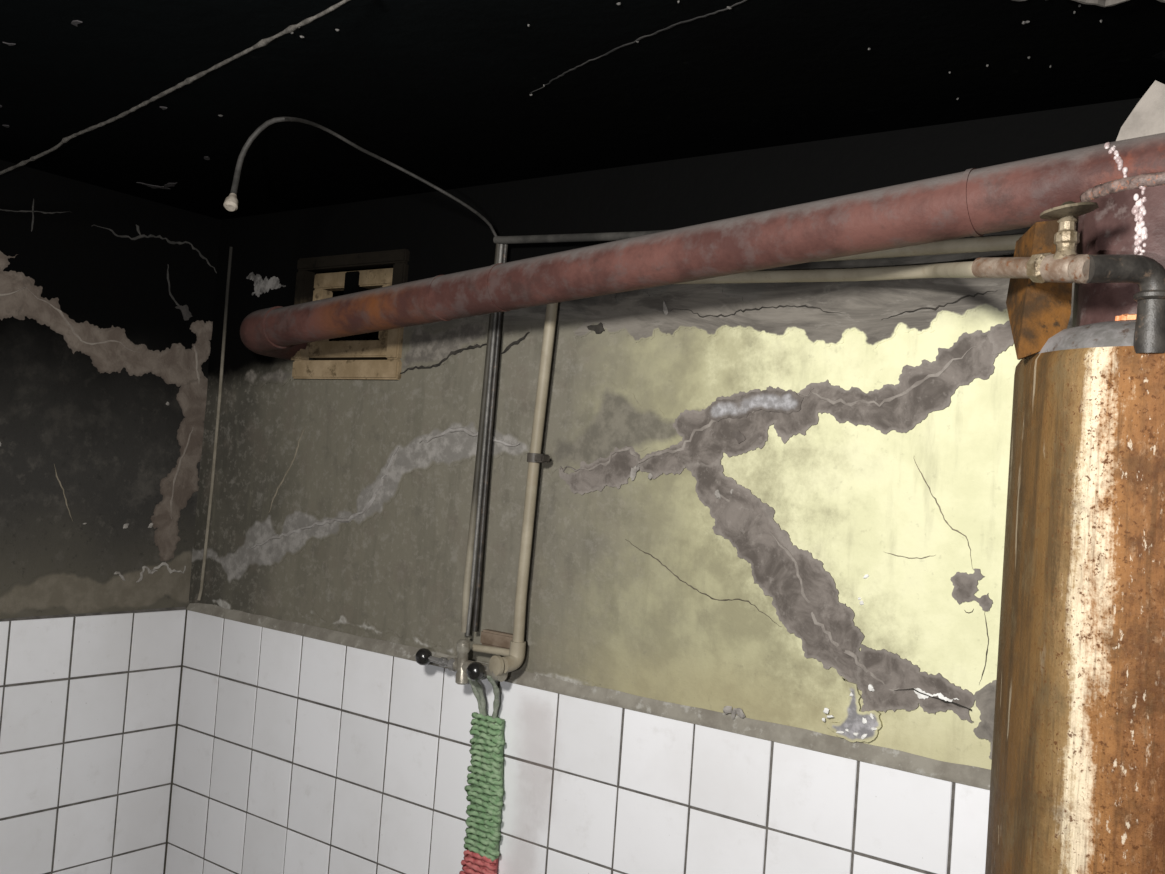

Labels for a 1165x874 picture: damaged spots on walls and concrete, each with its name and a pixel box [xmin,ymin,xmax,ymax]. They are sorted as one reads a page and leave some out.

peeling [970,250,1012,261]
crack [400,332,530,374]
peeling [0,251,213,562]
peeling [548,262,1014,759]
damp [114,562,186,582]
damp [822,677,883,743]